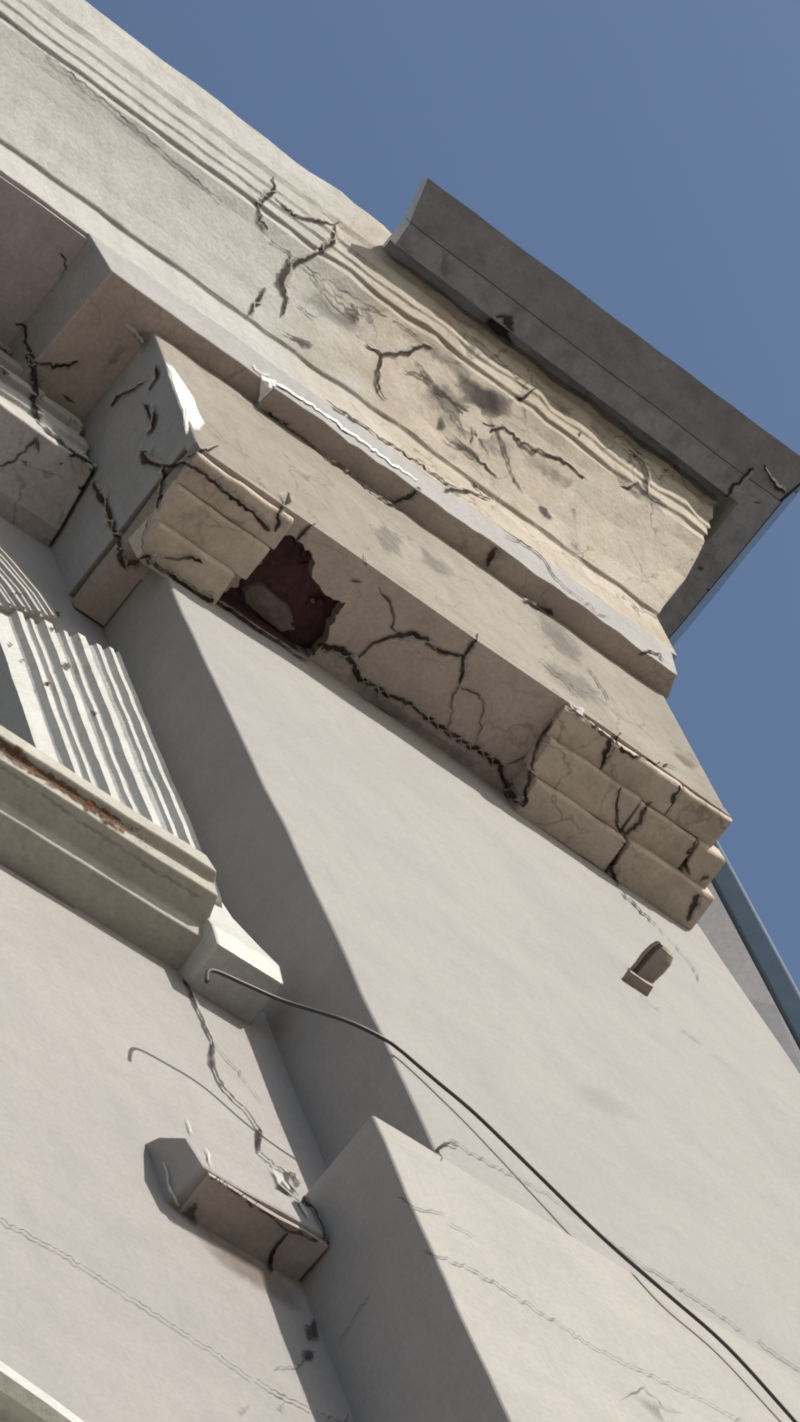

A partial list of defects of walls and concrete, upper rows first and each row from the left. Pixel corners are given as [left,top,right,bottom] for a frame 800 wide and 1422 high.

crack [1,16,211,193]
crack [250,177,668,510]
spalling [224,535,339,649]
crack [0,323,699,977]
crack [182,978,329,1273]